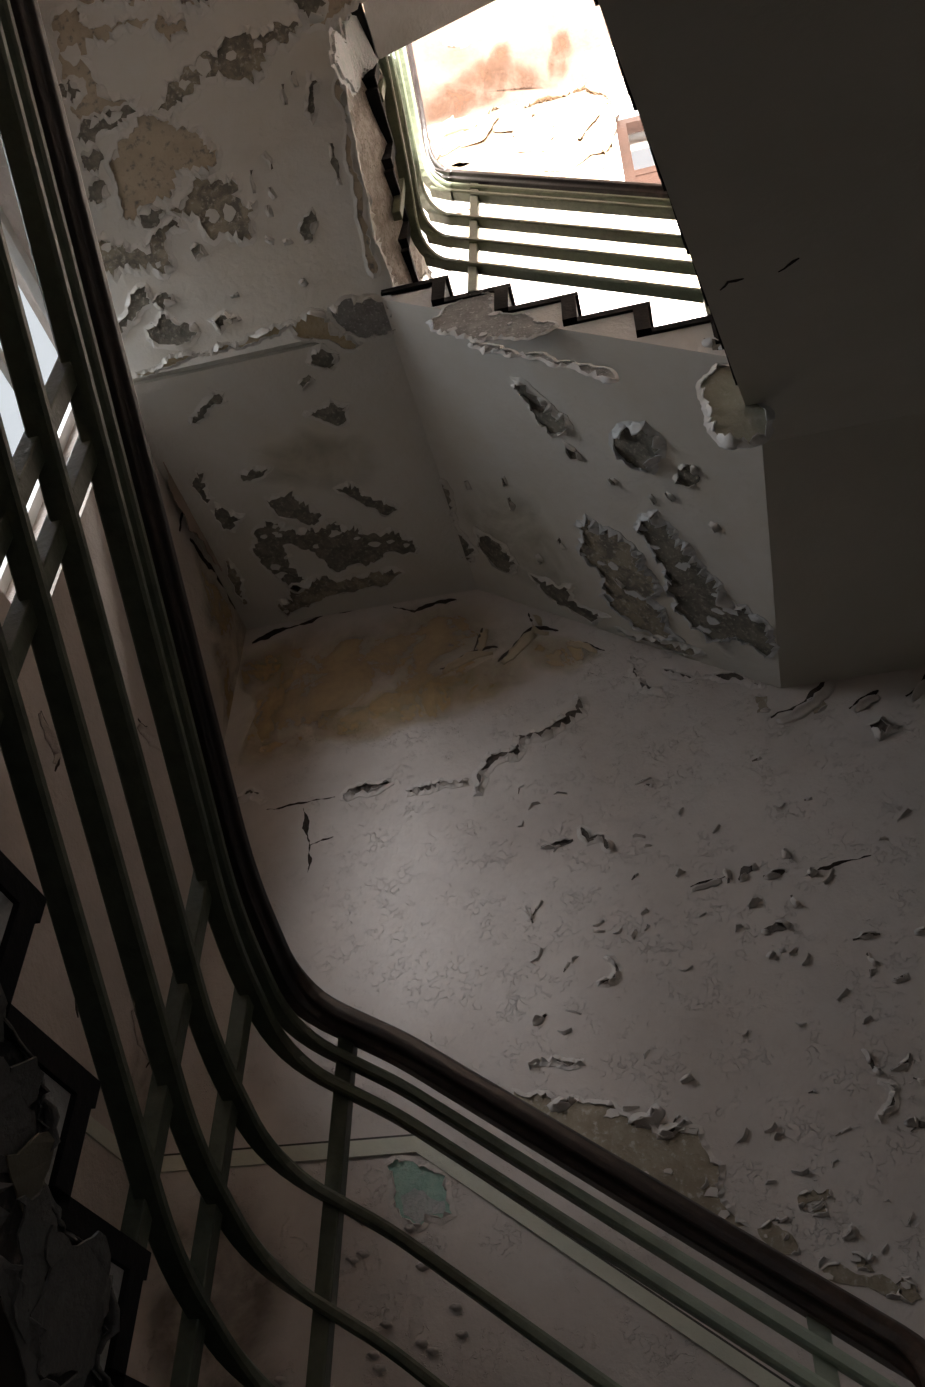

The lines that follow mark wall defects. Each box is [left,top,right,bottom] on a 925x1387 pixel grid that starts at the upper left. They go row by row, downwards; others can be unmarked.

peeling [428,83,619,180]
peeling [46,0,433,391]
peeling [425,292,620,384]
peeling [510,377,583,462]
peeling [695,336,775,451]
peeling [188,465,421,619]
peeling [438,421,780,659]
peeling [338,690,591,802]
peeling [541,824,615,854]
peeling [0,983,120,1387]
peeling [511,1088,834,1255]
peeling [818,1222,922,1305]